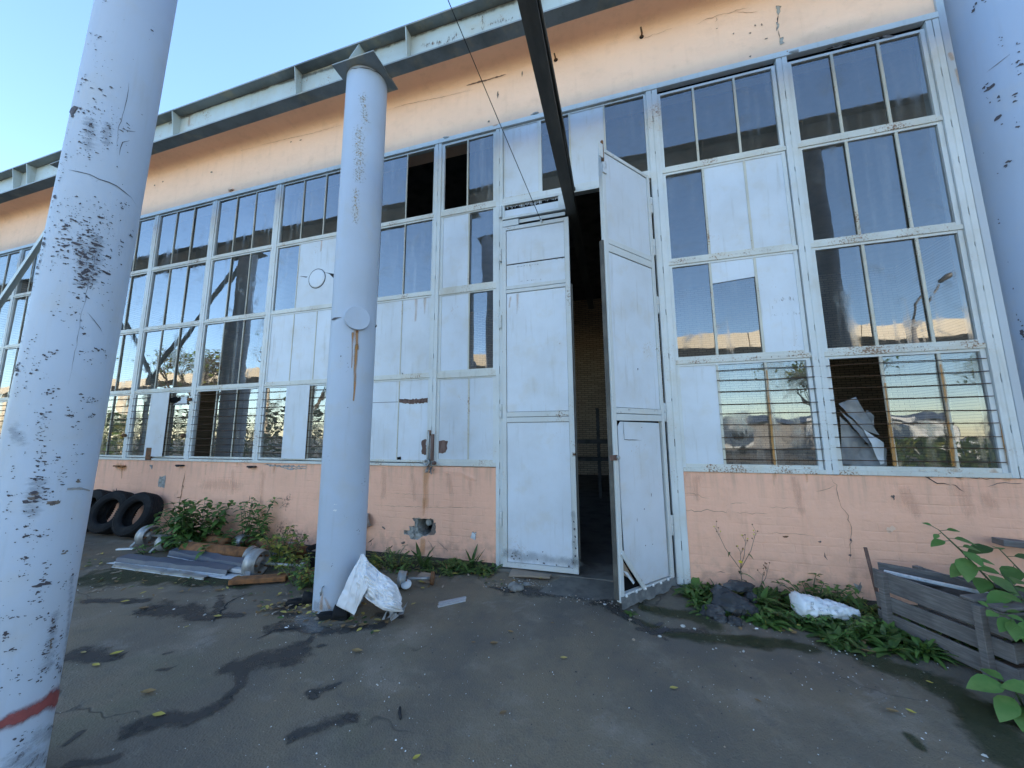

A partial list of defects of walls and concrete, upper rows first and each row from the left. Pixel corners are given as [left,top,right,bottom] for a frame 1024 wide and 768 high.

peeling [982,83,1020,128]
peeling [30,32,134,335]
hole [401,513,441,550]
crack [689,480,852,563]